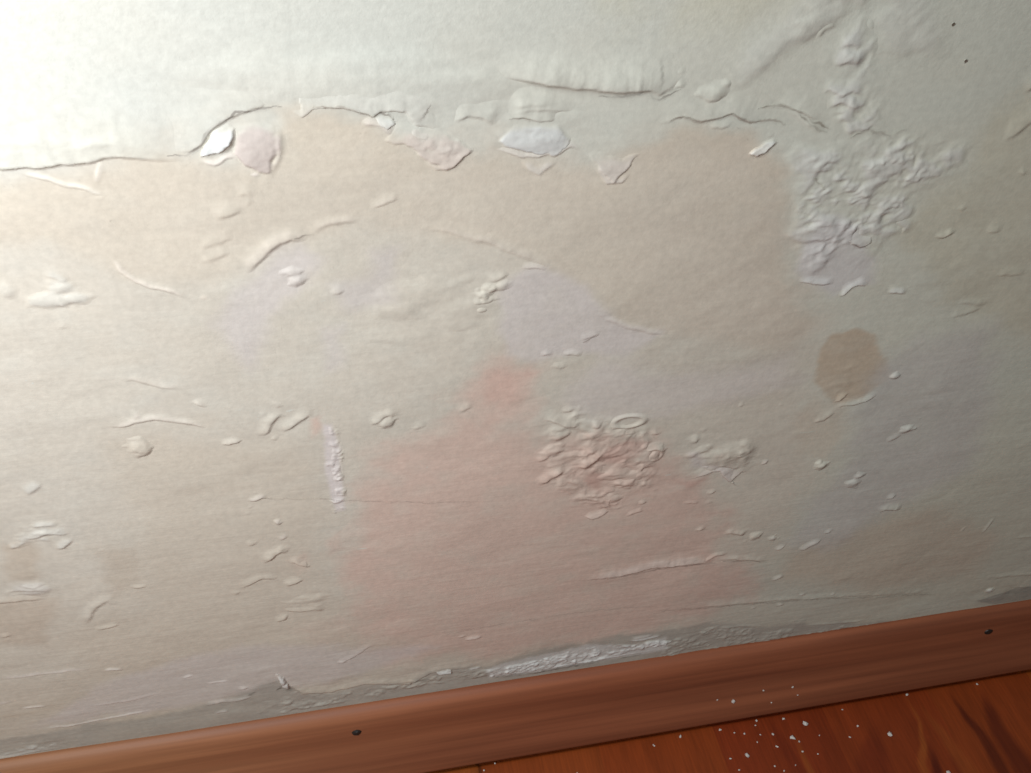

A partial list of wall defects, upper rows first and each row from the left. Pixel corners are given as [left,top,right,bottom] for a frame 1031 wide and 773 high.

peeling [0,67,641,185]
water stain [0,674,84,737]